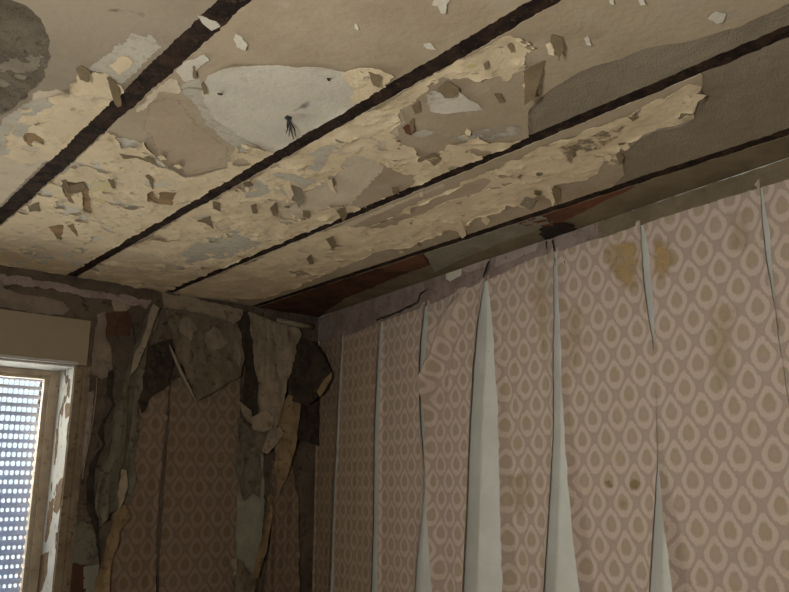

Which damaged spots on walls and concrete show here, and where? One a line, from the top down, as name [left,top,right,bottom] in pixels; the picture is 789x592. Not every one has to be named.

peeling [0,0,789,341]
peeling [41,367,74,592]
flaking render [235,453,265,574]